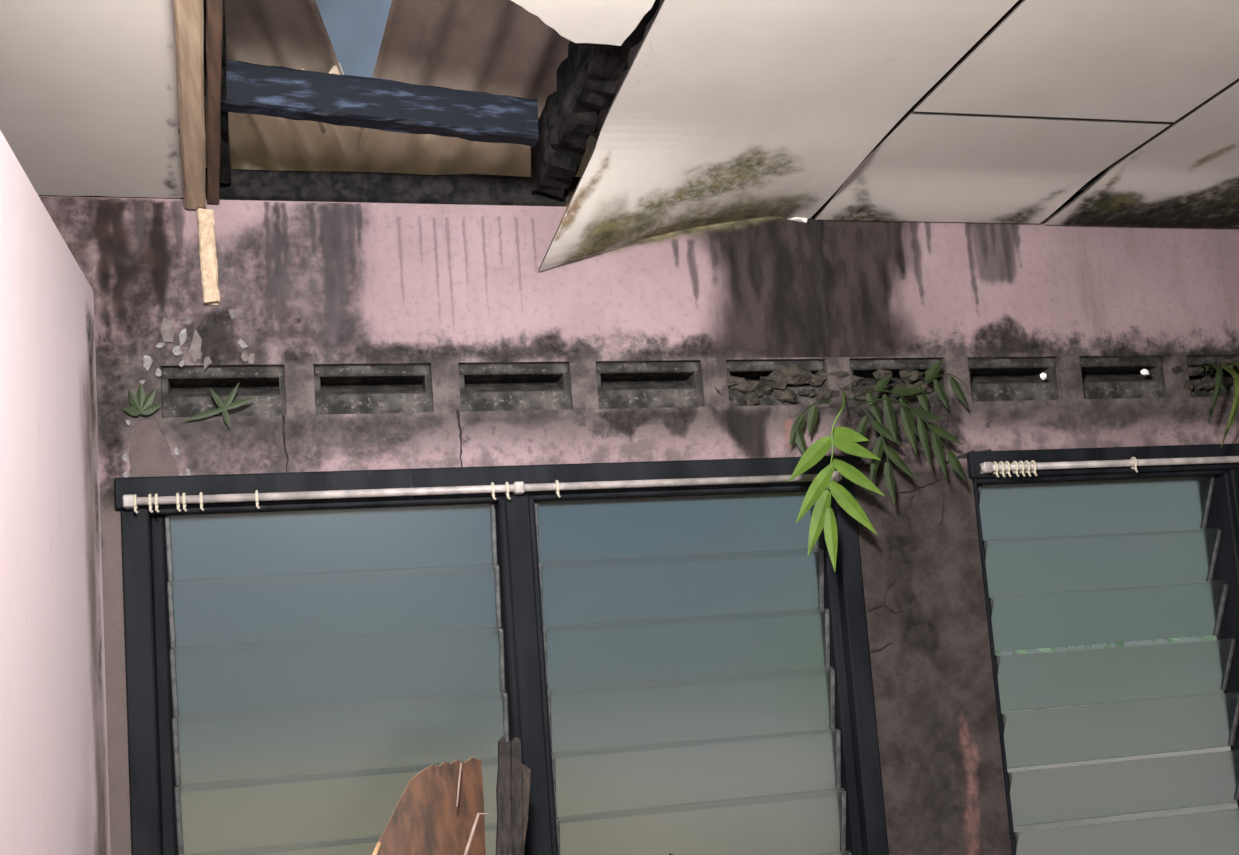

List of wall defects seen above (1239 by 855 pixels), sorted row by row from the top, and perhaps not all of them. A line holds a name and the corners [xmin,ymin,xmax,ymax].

water stain [556,159,607,239]
water stain [1064,178,1239,229]
water stain [637,205,930,362]
water stain [966,209,1037,292]
water stain [975,317,1053,358]
water stain [39,181,577,667]
mould [603,405,695,436]
water stain [721,409,767,458]
water stain [830,397,963,476]
water stain [96,740,106,855]